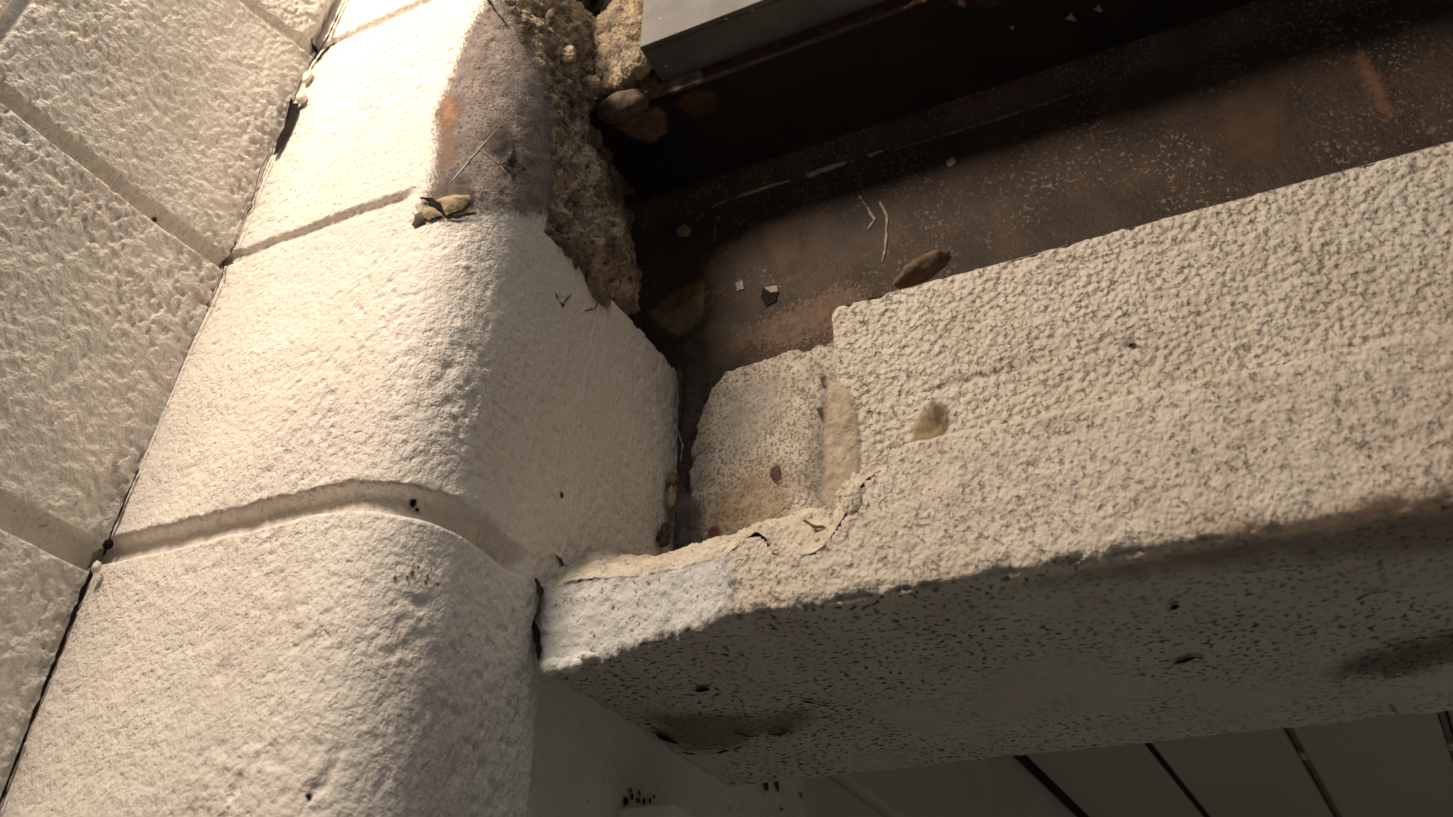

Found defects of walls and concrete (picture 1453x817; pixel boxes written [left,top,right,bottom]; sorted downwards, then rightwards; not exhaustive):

crack [282,0,346,103]
spalling [412,0,653,315]
crack [0,154,272,805]